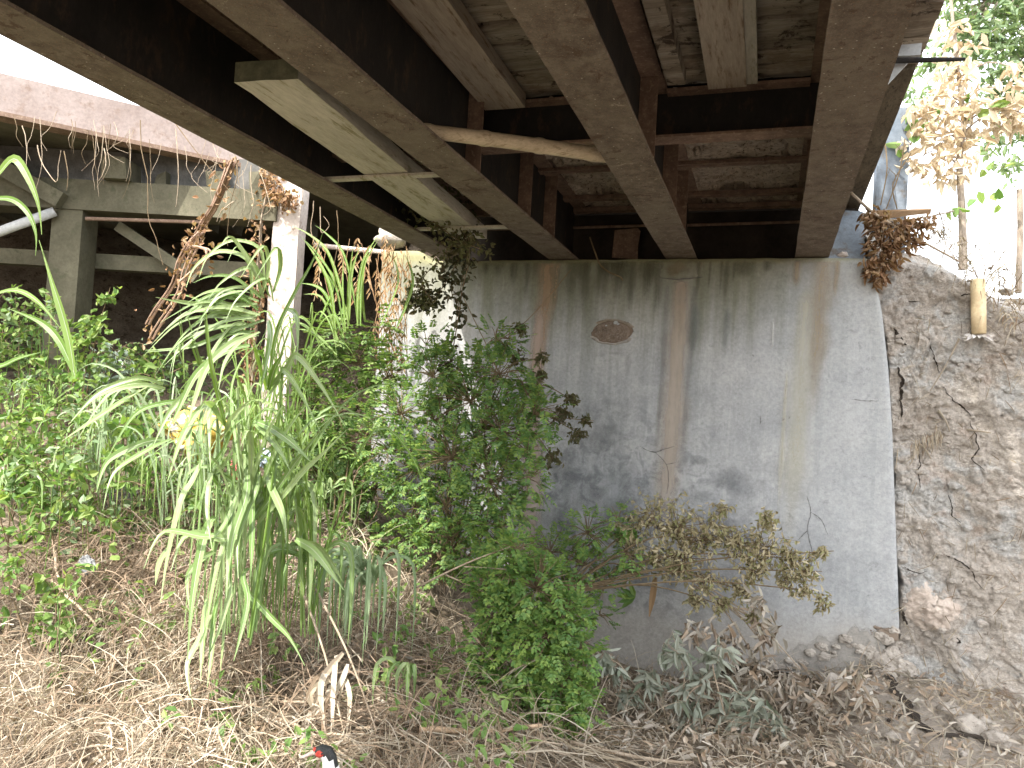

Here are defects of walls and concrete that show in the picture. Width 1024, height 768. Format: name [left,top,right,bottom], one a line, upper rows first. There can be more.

spalling [590,319,634,345]
crack [799,497,827,566]